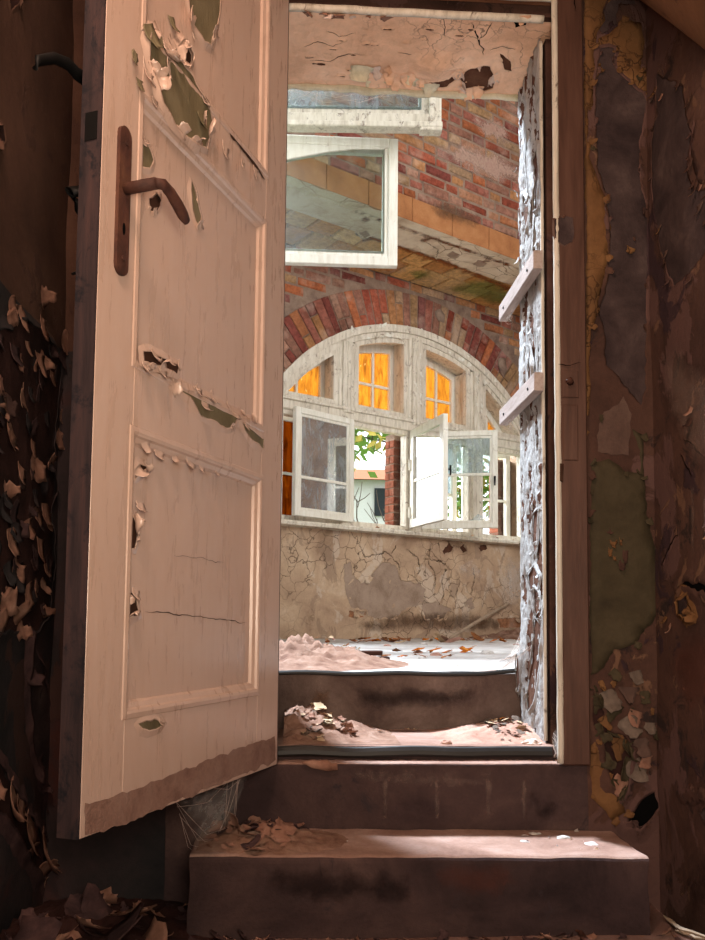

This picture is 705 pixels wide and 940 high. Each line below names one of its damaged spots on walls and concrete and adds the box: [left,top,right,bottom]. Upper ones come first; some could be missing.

peeling [303,10,395,32]
crack [441,19,516,55]
flaking render [511,15,531,29]
peeling [335,41,515,102]
flaking render [514,114,540,247]
flaking render [521,328,535,378]
peeling [0,285,68,898]
crack [358,542,476,603]
flaking render [478,506,543,744]
peeling [660,584,698,633]
crack [674,568,705,606]
peeling [590,668,660,845]